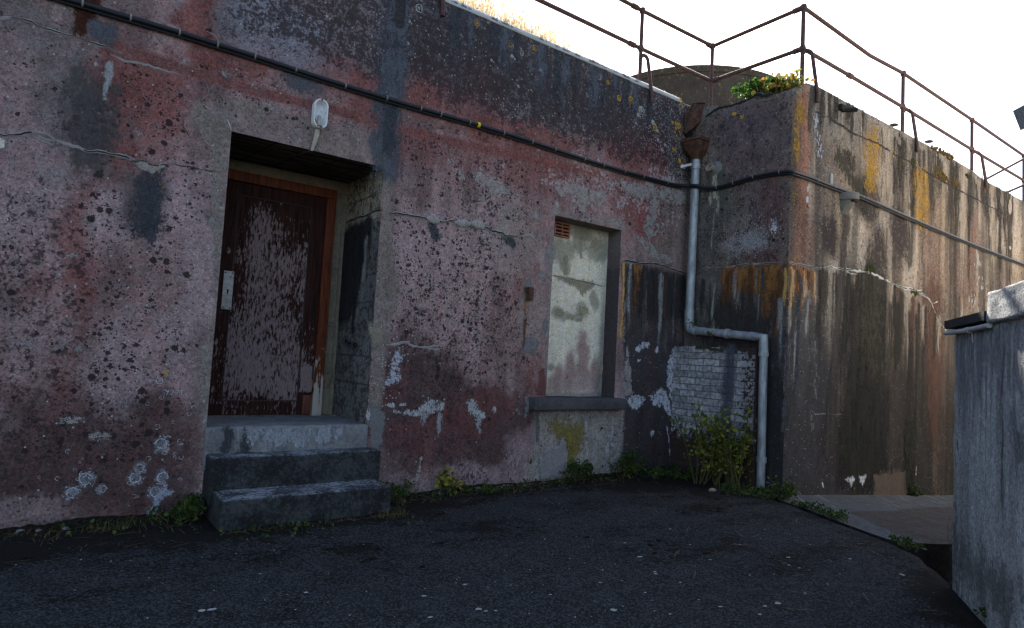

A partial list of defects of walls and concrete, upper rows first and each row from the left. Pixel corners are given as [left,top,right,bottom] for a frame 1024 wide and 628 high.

crack [0,16,210,95]
water stain [369,0,415,185]
crack [0,130,224,172]
water stain [125,167,169,249]
crack [345,209,538,241]
water stain [808,86,1014,285]
rust [720,263,816,336]
crack [622,227,947,331]
water stain [620,213,941,495]
peeling [366,397,444,449]
peeling [466,398,496,434]